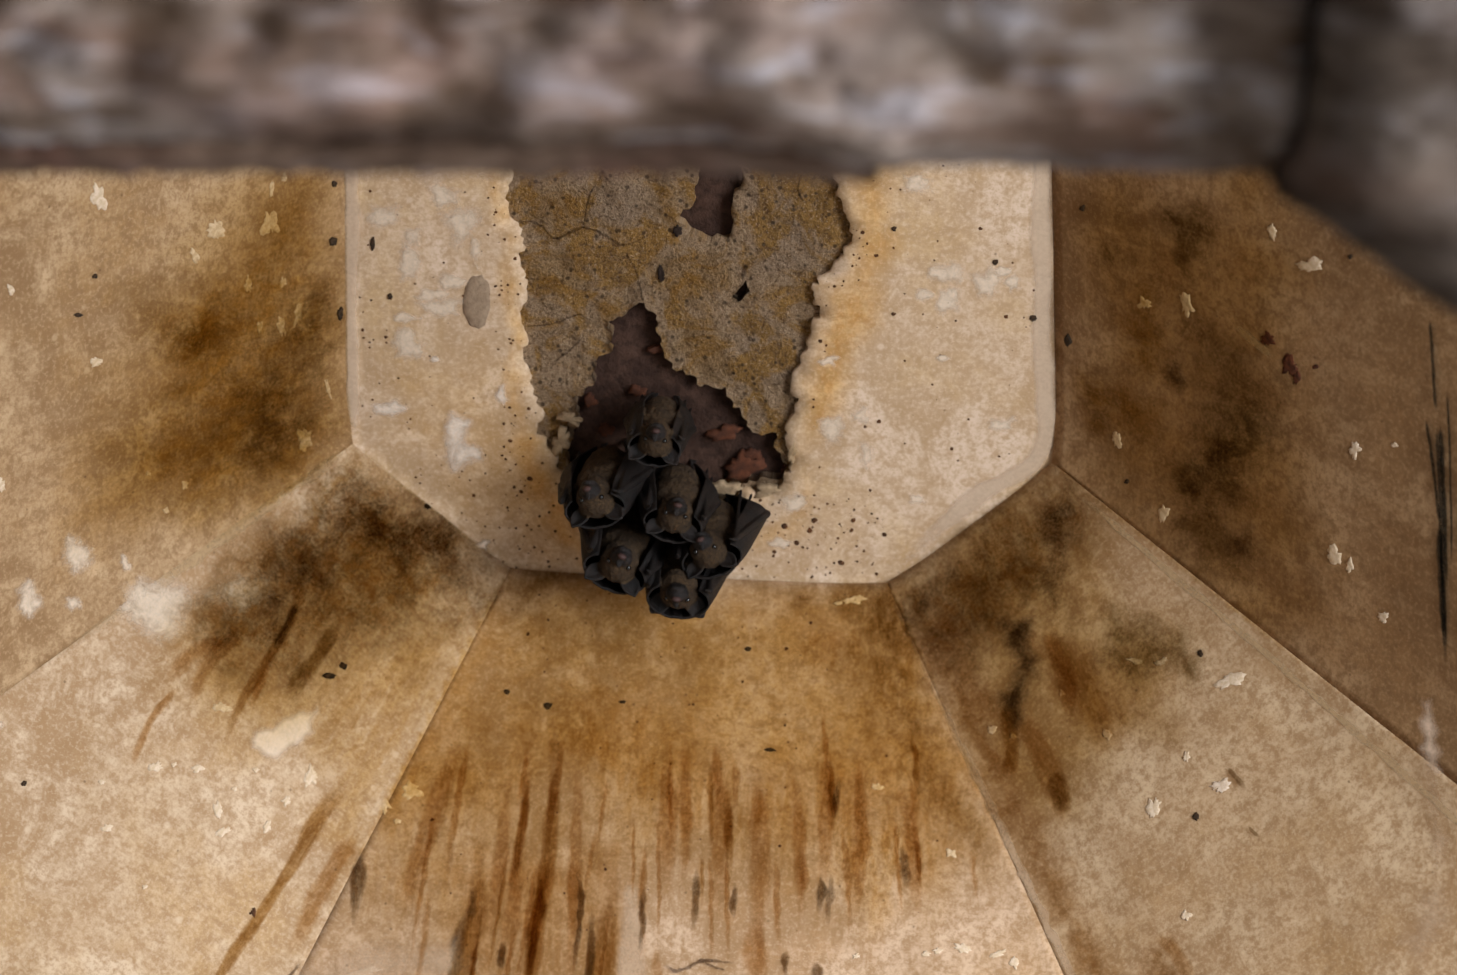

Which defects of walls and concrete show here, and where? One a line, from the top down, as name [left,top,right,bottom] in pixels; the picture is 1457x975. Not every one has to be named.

flaking render [505,171,853,511]
peeling [821,408,869,440]
leakage [204,474,454,667]
leakage [322,662,347,679]
leakage [1006,623,1034,736]